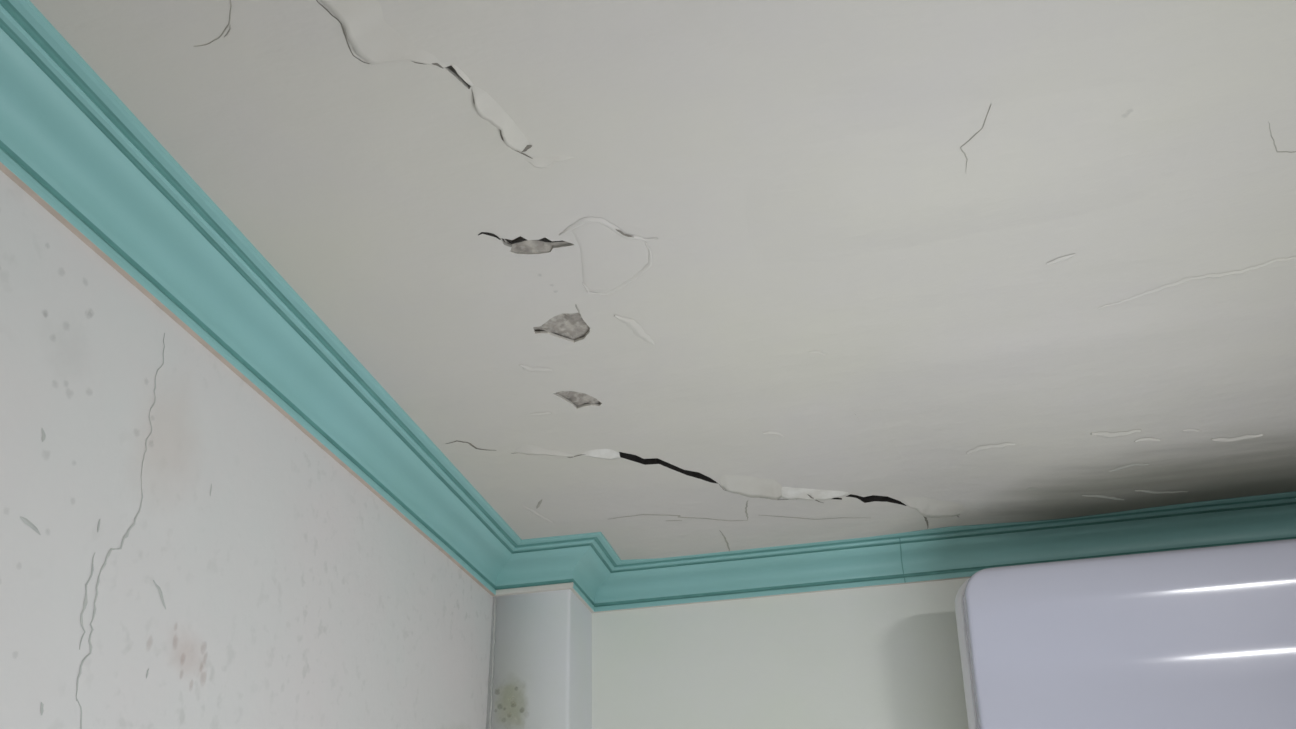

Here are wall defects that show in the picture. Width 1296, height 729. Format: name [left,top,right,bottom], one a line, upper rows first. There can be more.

crack [201,0,232,46]
crack [316,0,574,168]
spalling [478,232,574,254]
spalling [533,305,590,342]
spalling [553,391,602,409]
crack [76,333,165,729]
crack [446,441,964,583]